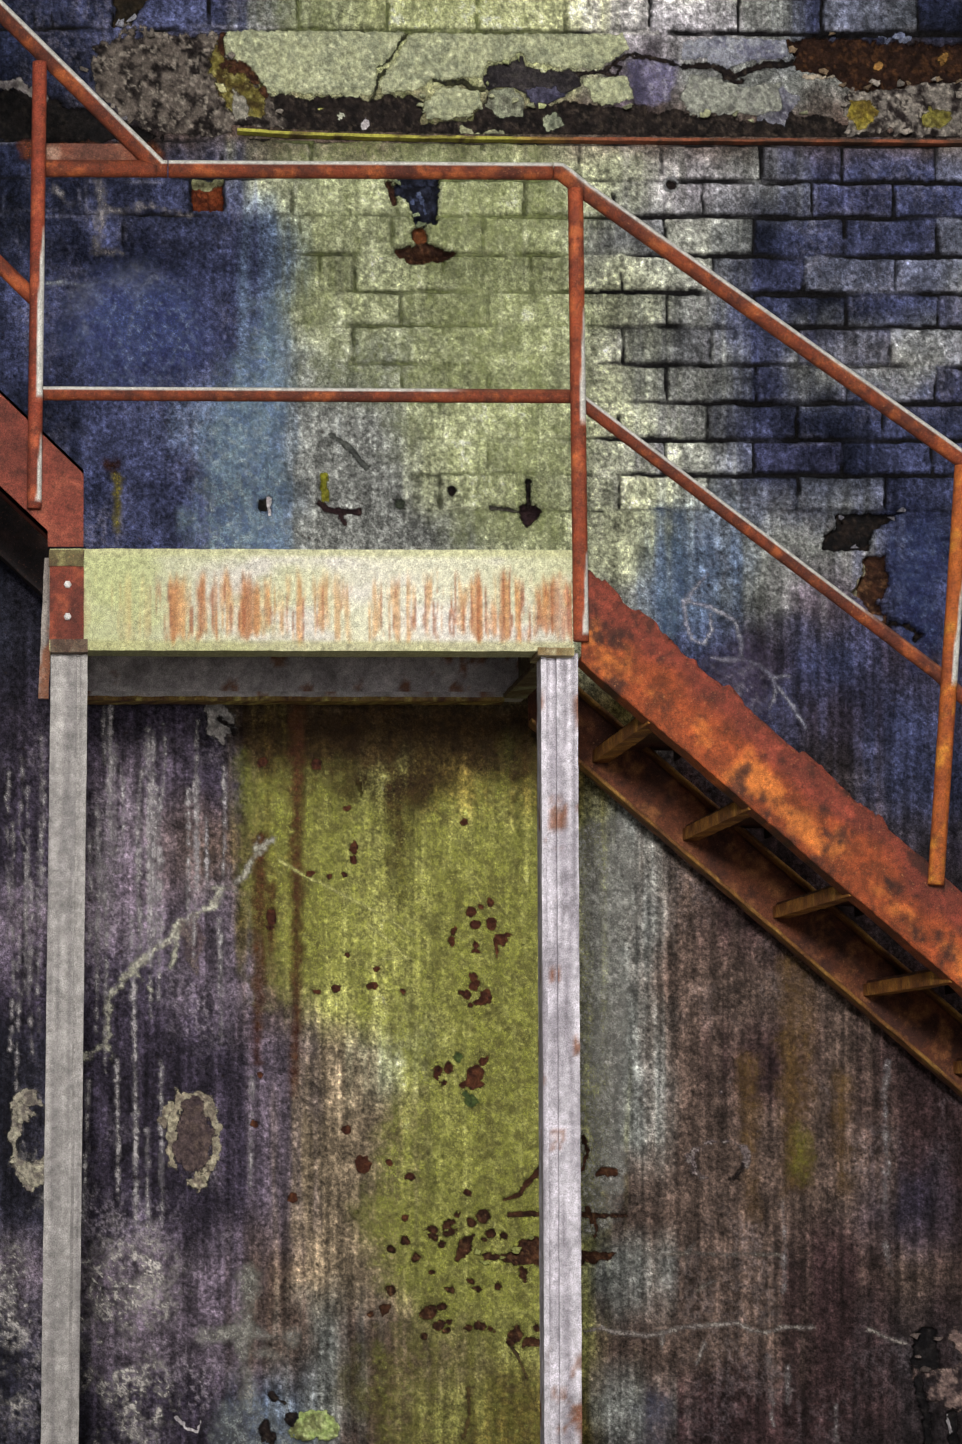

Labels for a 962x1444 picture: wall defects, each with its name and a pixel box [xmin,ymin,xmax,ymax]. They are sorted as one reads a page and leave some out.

spalling [0,77,118,144]
crack [371,33,408,100]
crack [433,78,486,92]
flaking render [80,0,962,142]
crack [576,51,794,84]
spalling [384,179,457,265]
spalling [822,507,924,643]
leakage [186,781,209,883]
leakage [237,698,536,975]
leakage [88,708,166,1222]
leakage [442,843,538,1211]
peeling [157,1087,223,1193]